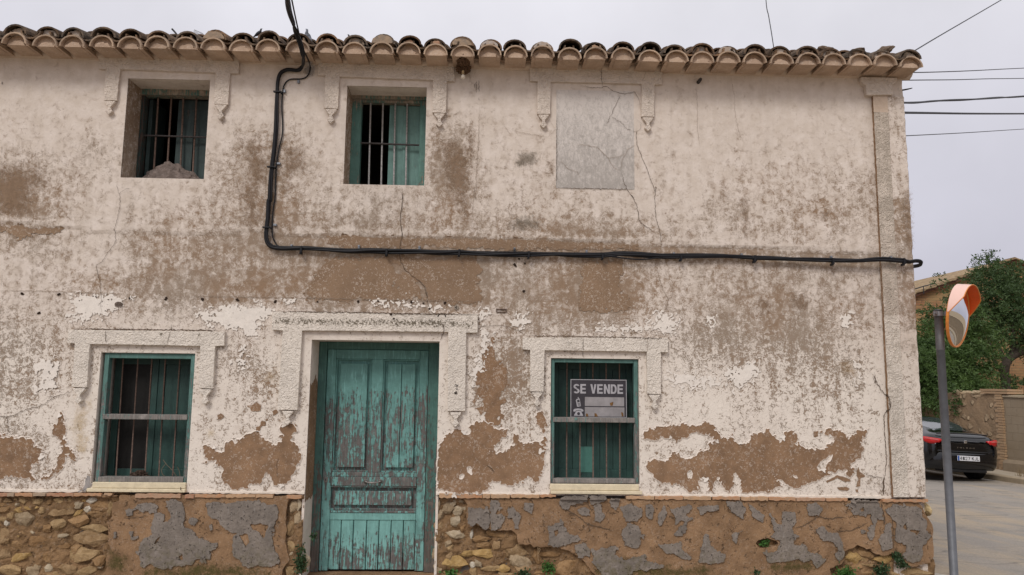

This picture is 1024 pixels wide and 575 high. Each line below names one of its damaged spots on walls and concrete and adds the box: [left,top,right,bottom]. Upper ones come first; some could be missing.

crack [507,69,662,245]
spalling [0,375,318,575]
peeling [191,233,935,575]
crack [796,375,894,547]